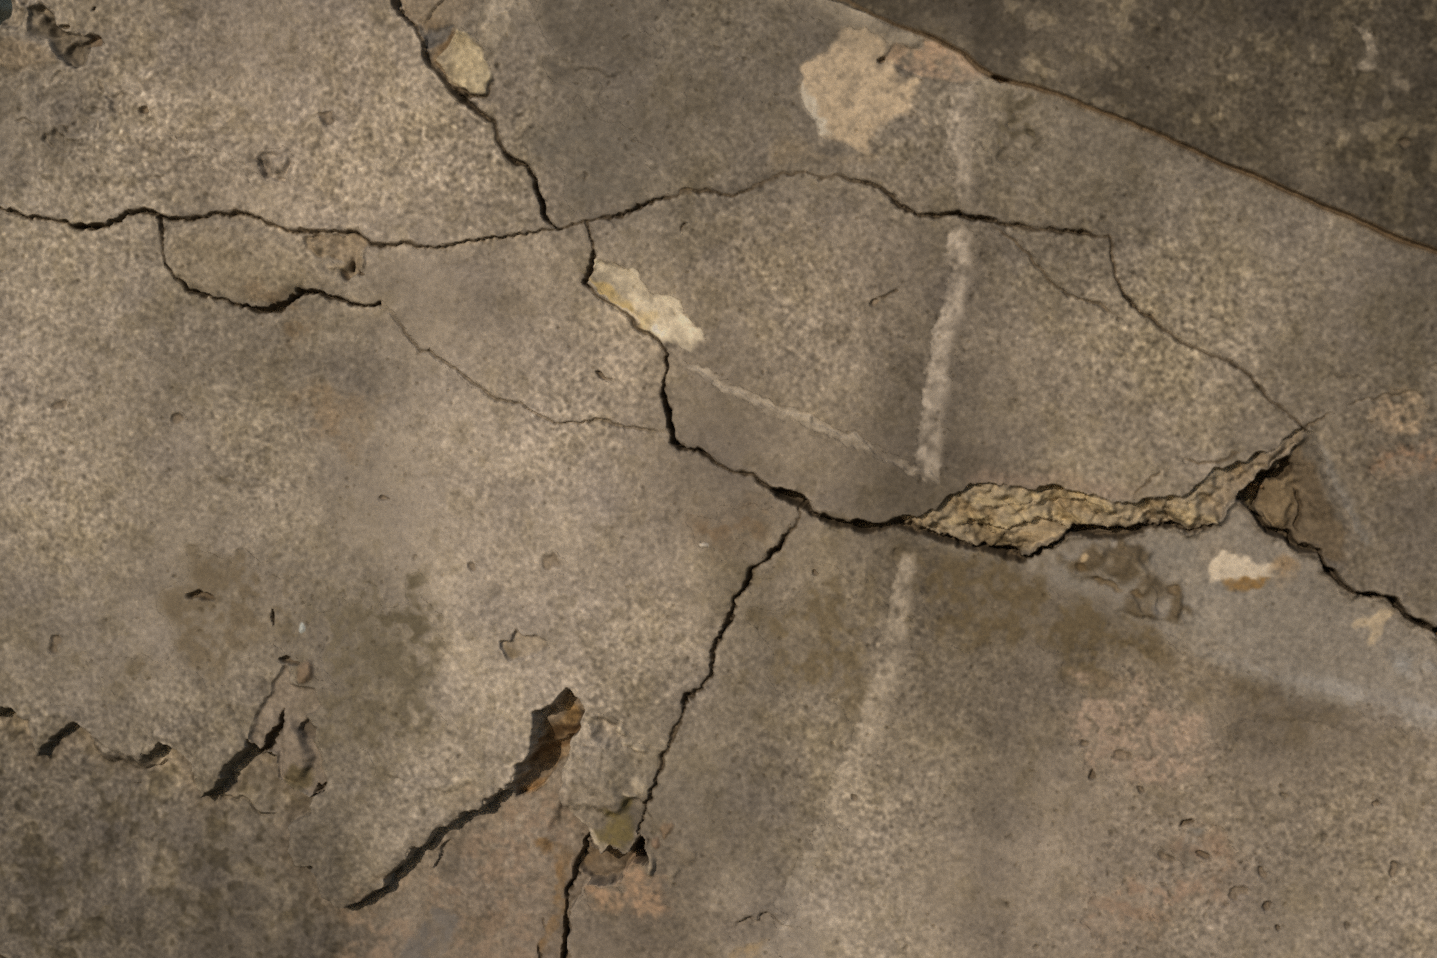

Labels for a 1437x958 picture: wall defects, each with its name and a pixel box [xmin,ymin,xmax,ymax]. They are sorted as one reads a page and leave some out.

crack [0,0,676,438]
spalling [402,0,483,73]
crack [832,0,1437,256]
crack [582,170,1335,833]
spalling [899,428,1437,736]
crack [1235,494,1437,639]
peeling [0,665,651,958]
crack [537,832,592,958]